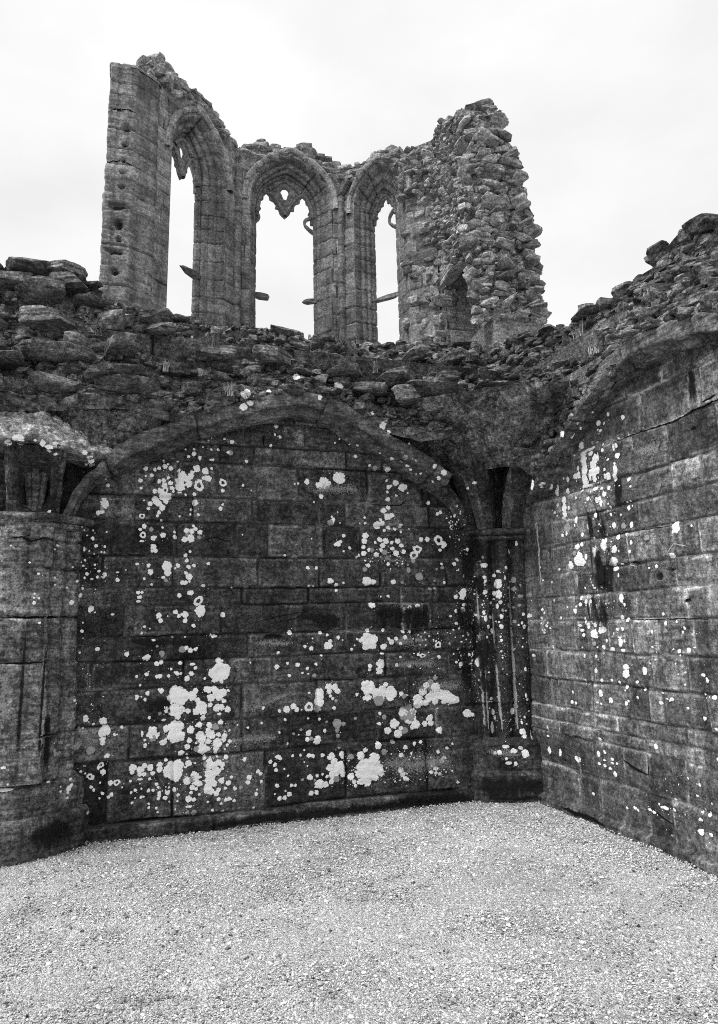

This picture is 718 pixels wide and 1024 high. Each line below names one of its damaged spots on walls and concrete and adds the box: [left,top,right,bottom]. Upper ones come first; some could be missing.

crack [617,394,718,441]
damp [587,509,613,627]